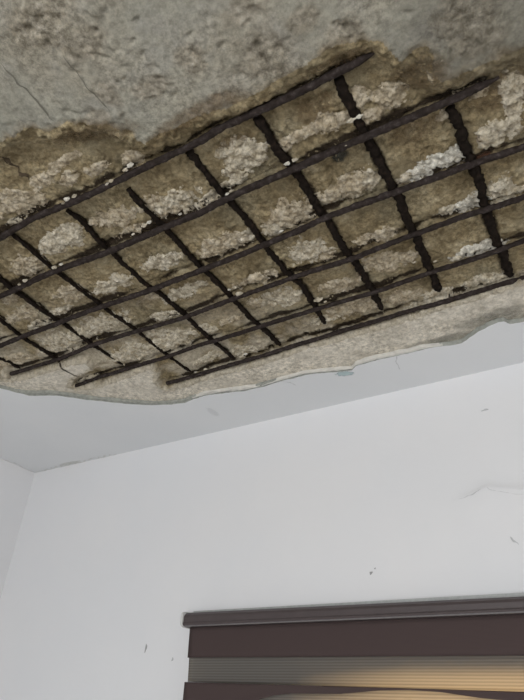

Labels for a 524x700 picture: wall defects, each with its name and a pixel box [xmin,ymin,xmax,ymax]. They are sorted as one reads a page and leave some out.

crack [3,66,53,121]
crack [63,56,109,110]
peeling [0,0,524,404]